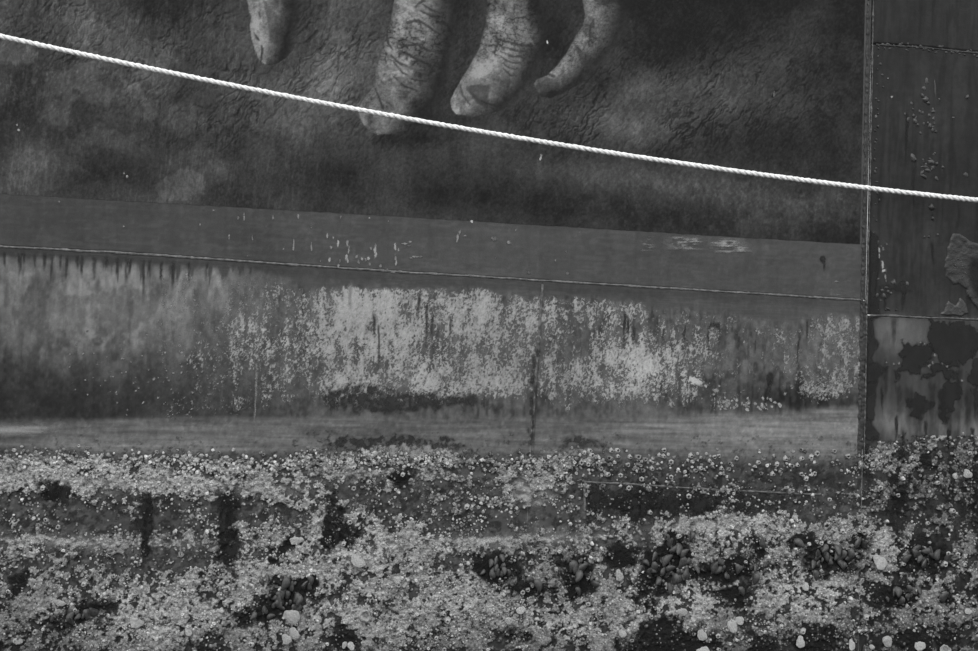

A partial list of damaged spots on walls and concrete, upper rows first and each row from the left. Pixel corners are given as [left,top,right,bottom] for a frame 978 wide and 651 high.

damp [18,254,174,282]
peeling [940,233,978,317]